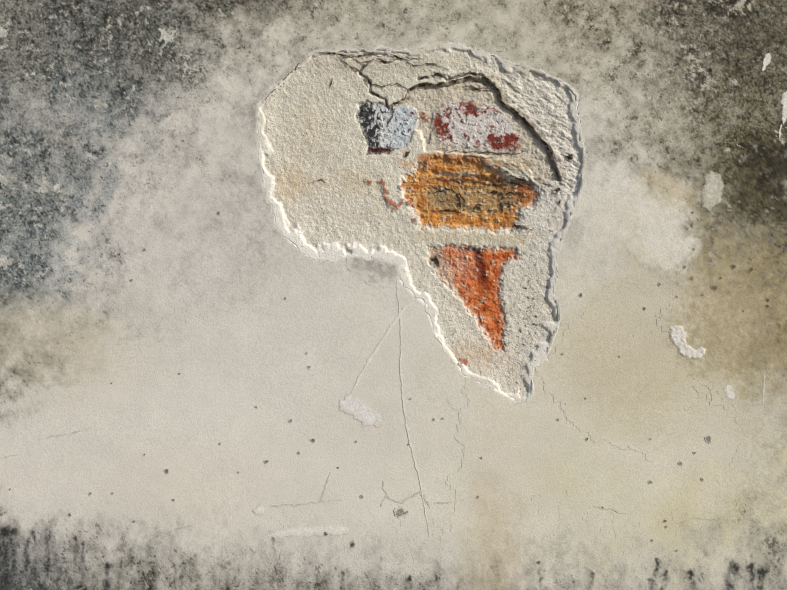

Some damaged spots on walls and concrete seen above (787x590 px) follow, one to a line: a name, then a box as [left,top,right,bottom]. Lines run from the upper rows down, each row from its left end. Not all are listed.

water stain [0,0,294,401]
crack [262,52,560,232]
spalling [257,43,586,405]
water stain [217,0,787,590]
water stain [0,486,453,590]
crack [273,472,342,507]
crack [381,480,463,507]